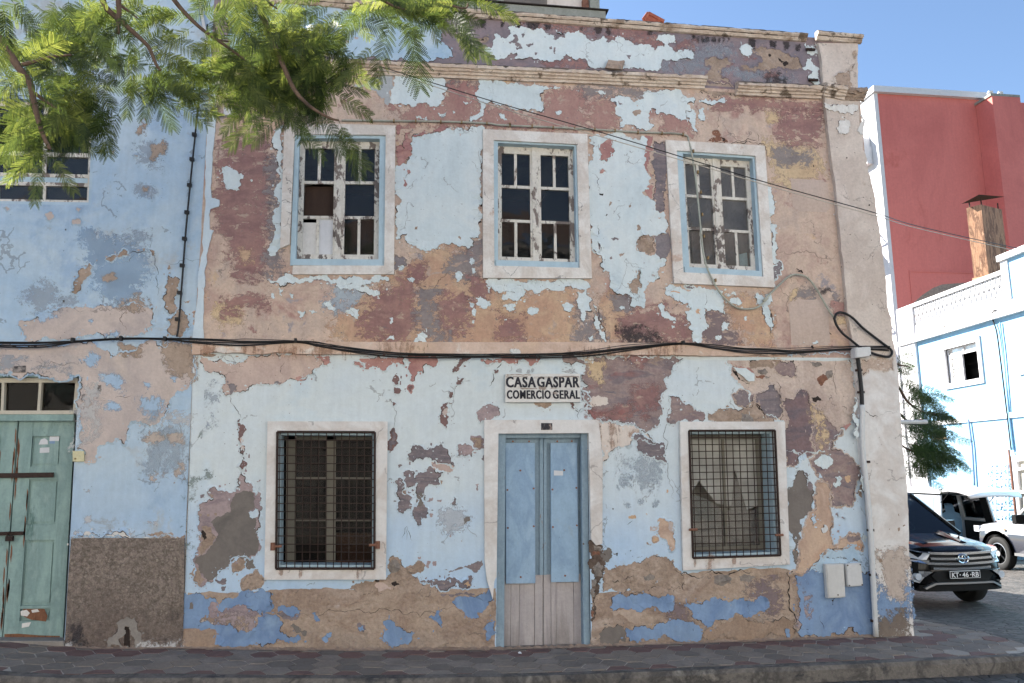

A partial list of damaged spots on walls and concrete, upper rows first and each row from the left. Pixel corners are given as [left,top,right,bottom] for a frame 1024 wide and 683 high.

flaking render [0,247,331,465]
peeling [210,21,917,643]
flaking render [67,418,320,647]
peeling [379,615,420,648]